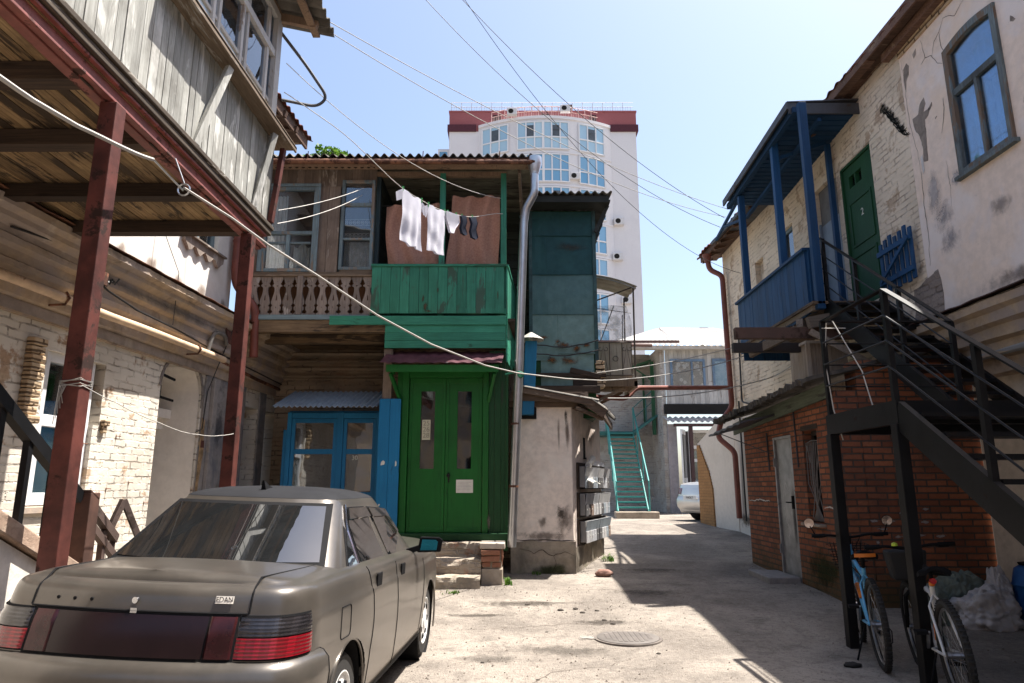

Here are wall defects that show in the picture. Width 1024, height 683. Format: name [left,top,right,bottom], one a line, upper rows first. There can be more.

peeling [912,97,932,173]
spalling [914,269,945,320]
water stain [530,507,568,539]